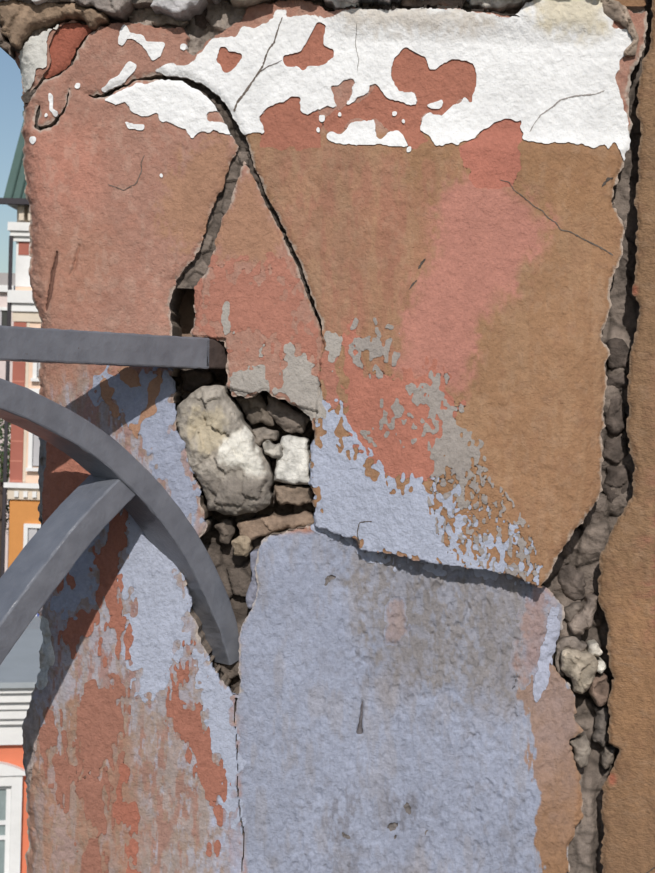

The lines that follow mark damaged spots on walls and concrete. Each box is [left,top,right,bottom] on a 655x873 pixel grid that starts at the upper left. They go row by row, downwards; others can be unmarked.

peeling [45,93,59,118]
spalling [18,23,93,92]
crack [21,26,108,131]
crack [90,18,323,336]
peeling [101,2,633,189]
peeling [38,437,90,526]
peeling [88,252,543,636]
crack [501,0,653,873]
peeling [22,508,246,873]
crack [237,779,245,869]
peeling [513,607,584,873]